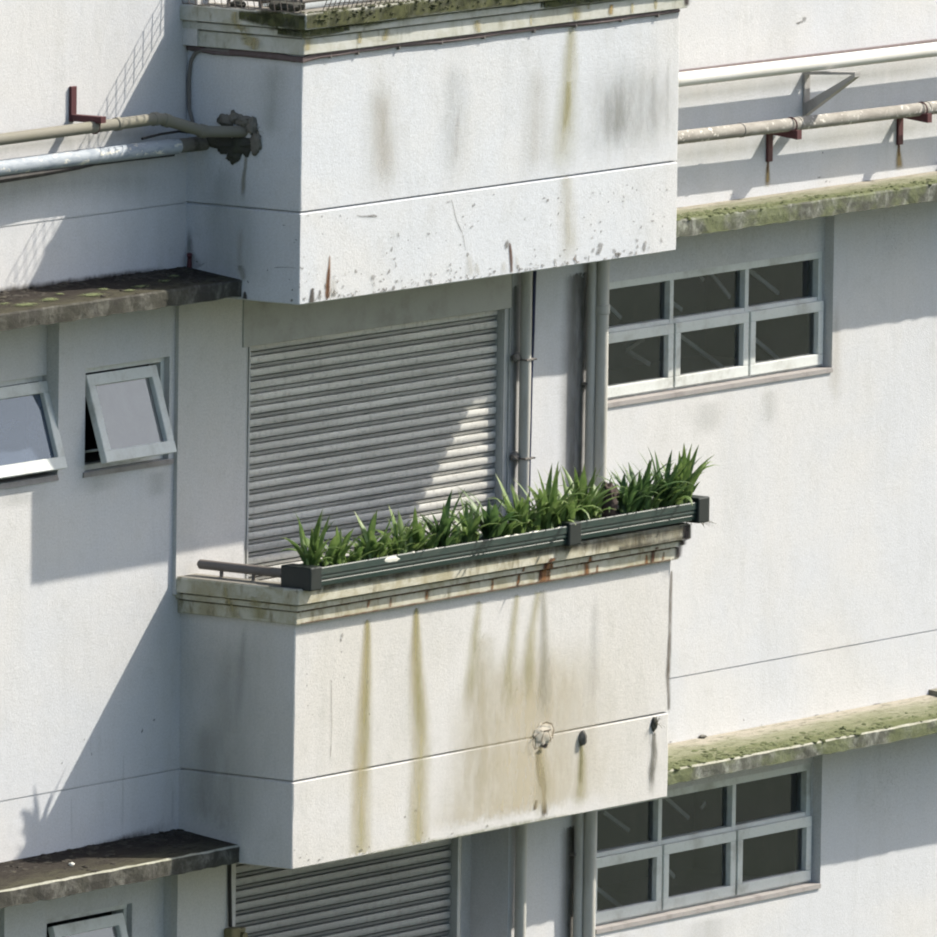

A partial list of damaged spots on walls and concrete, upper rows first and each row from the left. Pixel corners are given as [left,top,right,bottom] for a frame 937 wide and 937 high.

corrosion [297,547,673,843]